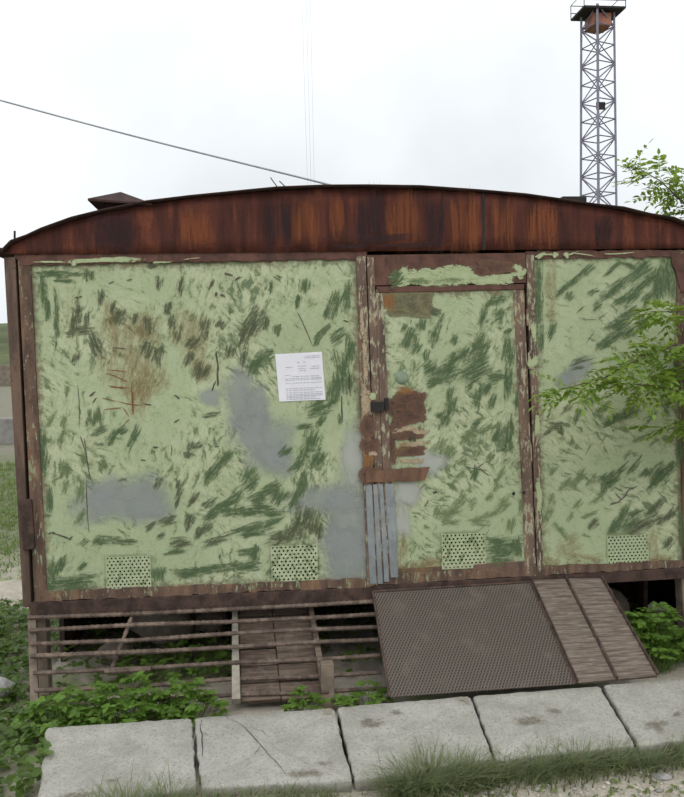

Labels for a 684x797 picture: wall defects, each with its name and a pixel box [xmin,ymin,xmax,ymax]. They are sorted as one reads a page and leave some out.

peeling [578,252,677,349]
peeling [80,535,137,545]
peeling [146,275,376,582]
peeling [384,250,595,567]
peeling [530,394,684,539]
peeling [607,497,683,550]